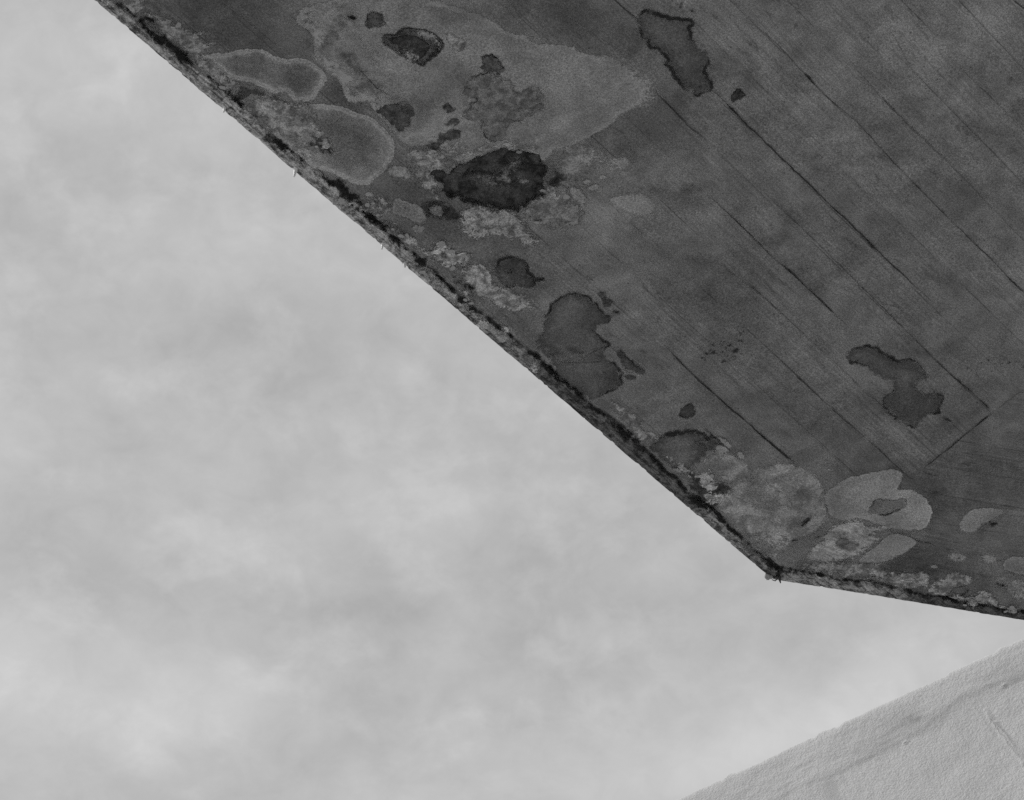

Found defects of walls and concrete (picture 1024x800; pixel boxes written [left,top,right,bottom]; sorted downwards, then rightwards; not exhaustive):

damp [109,0,1024,613]